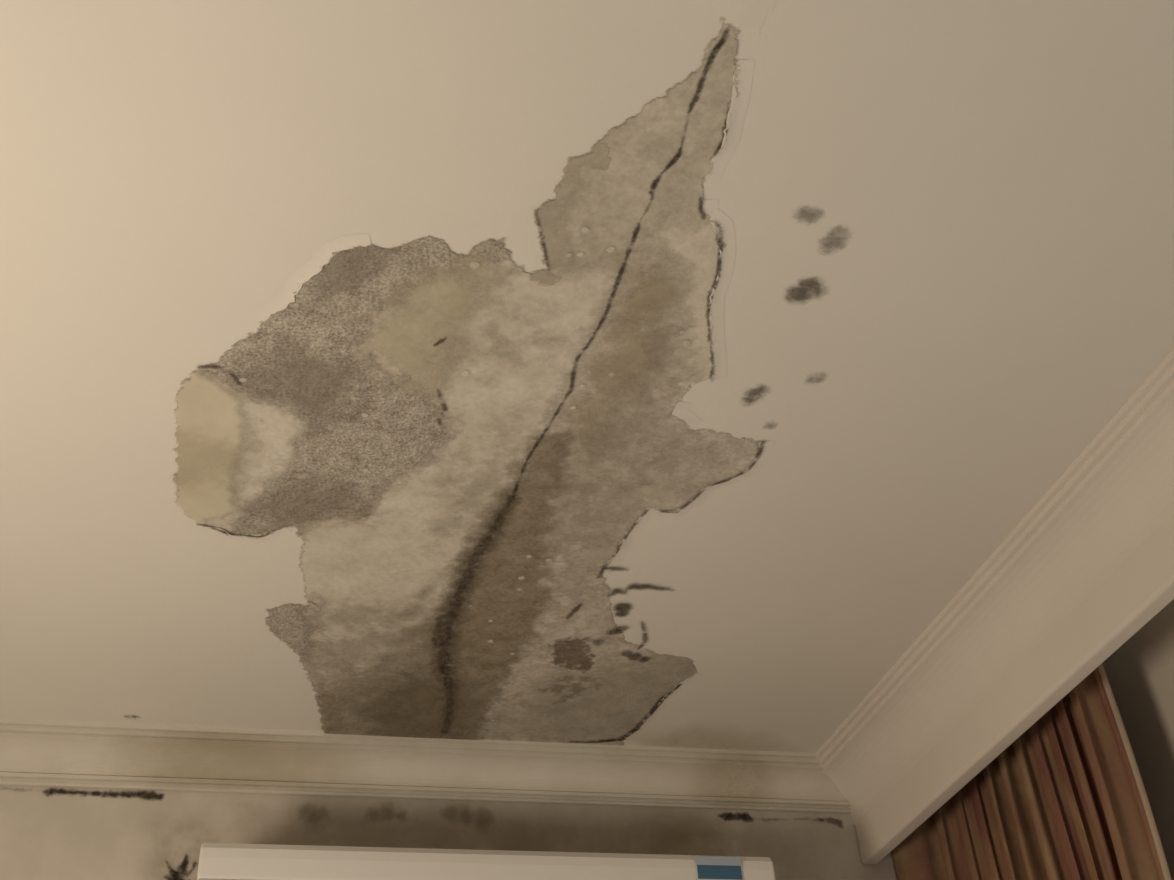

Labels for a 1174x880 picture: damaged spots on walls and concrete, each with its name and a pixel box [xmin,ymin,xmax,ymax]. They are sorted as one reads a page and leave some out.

peeling [173,19,775,745]
crack [432,30,728,733]
damp [744,386,764,403]
damp [593,584,669,645]
damp [622,623,648,662]
damp [43,789,163,799]
damp [719,813,753,821]